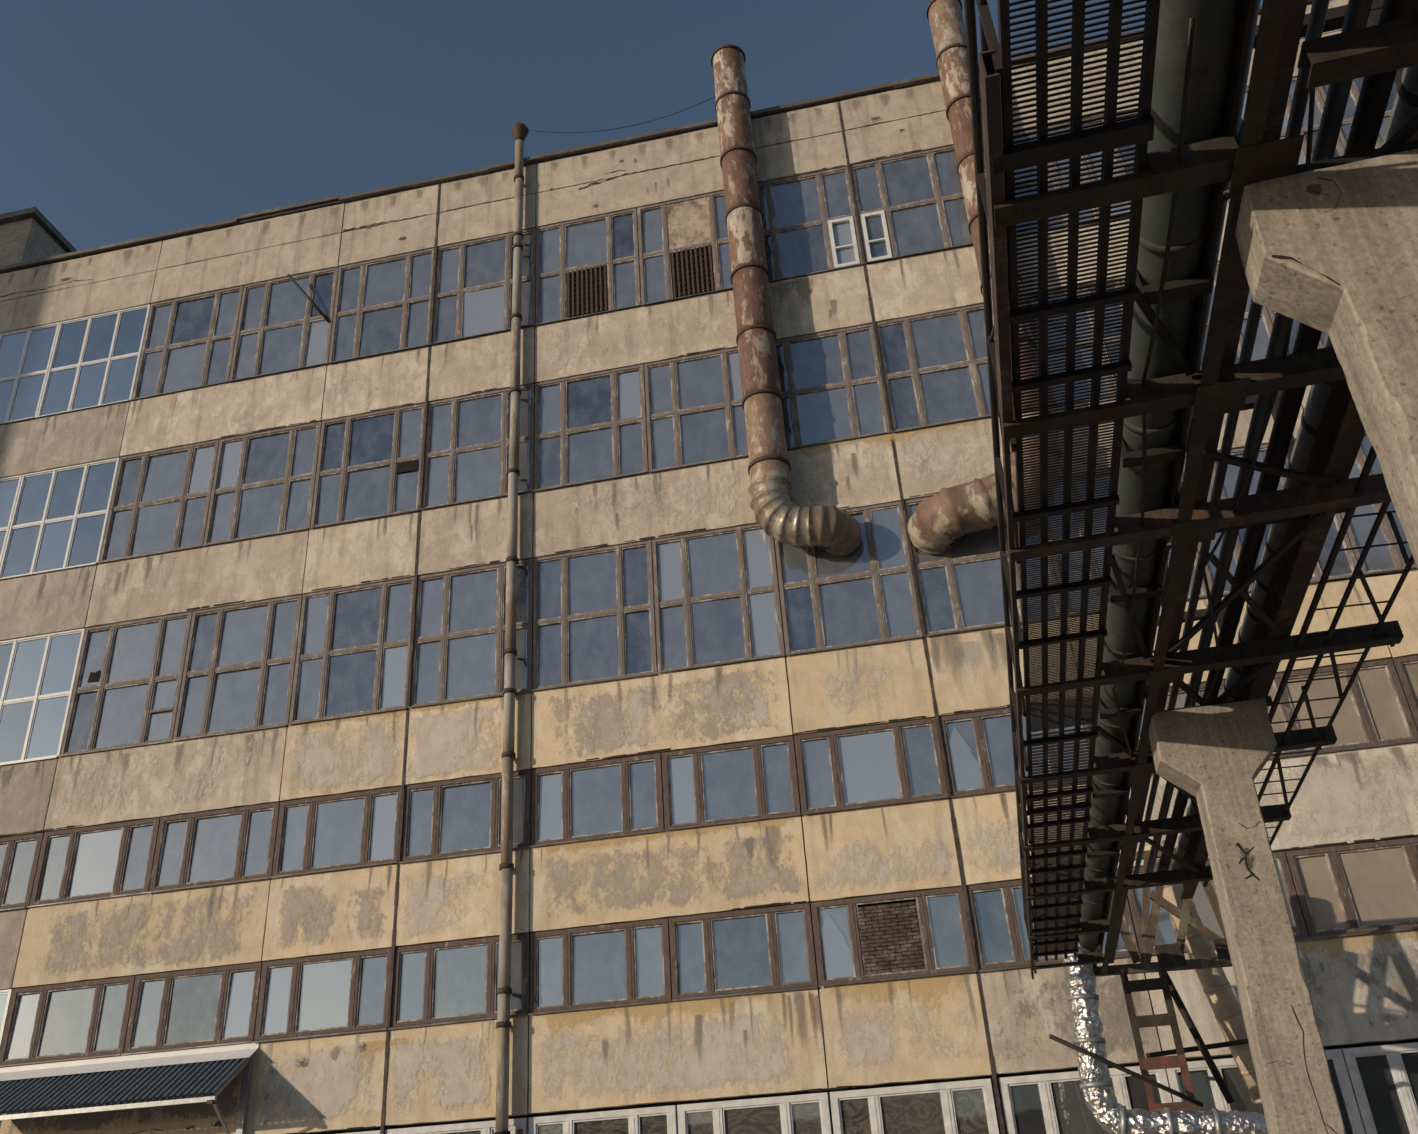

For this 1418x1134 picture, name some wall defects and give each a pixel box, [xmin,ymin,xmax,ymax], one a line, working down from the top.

peeling [549,669,774,761]
peeling [546,836,806,915]
crack [1236,821,1260,881]
peeling [45,887,256,972]
leakage [546,993,769,1045]
peeling [541,1014,791,1099]
leakage [787,973,964,1032]